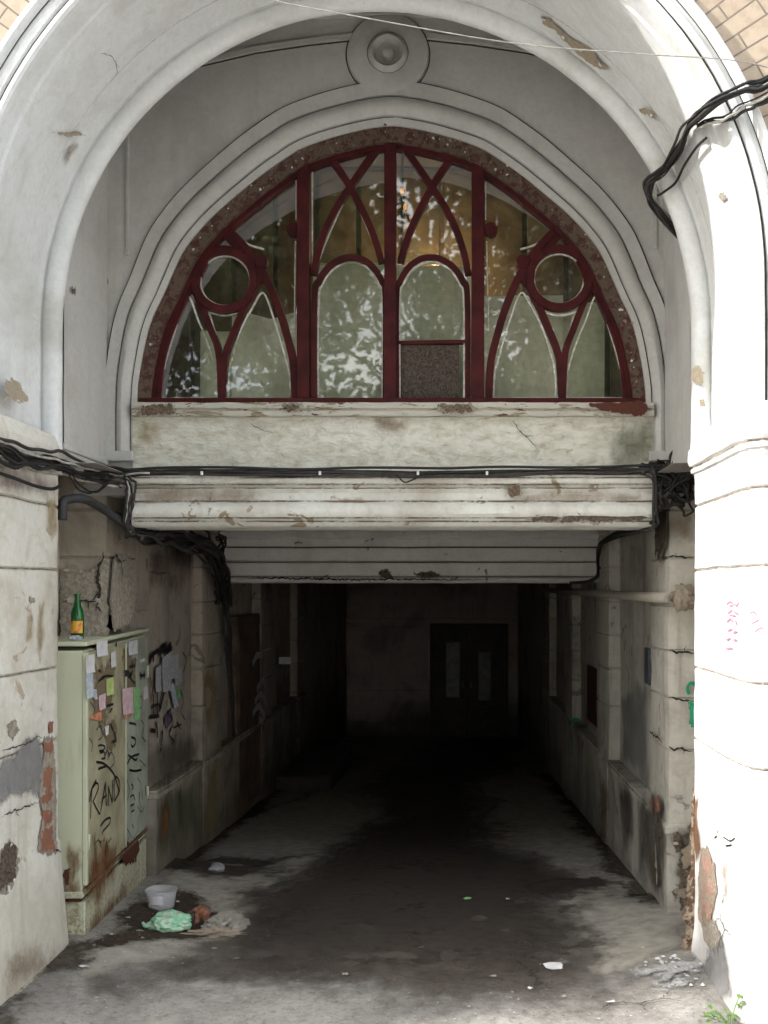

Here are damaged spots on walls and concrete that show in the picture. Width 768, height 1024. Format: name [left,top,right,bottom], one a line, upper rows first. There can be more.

peeling [540,16,609,70]
peeling [589,400,648,416]
crack [63,527,172,621]
crack [669,646,695,654]
crack [650,732,693,752]
spalling [37,721,58,857]
damp [600,785,646,871]
spalling [0,839,21,895]
spalling [645,788,723,952]